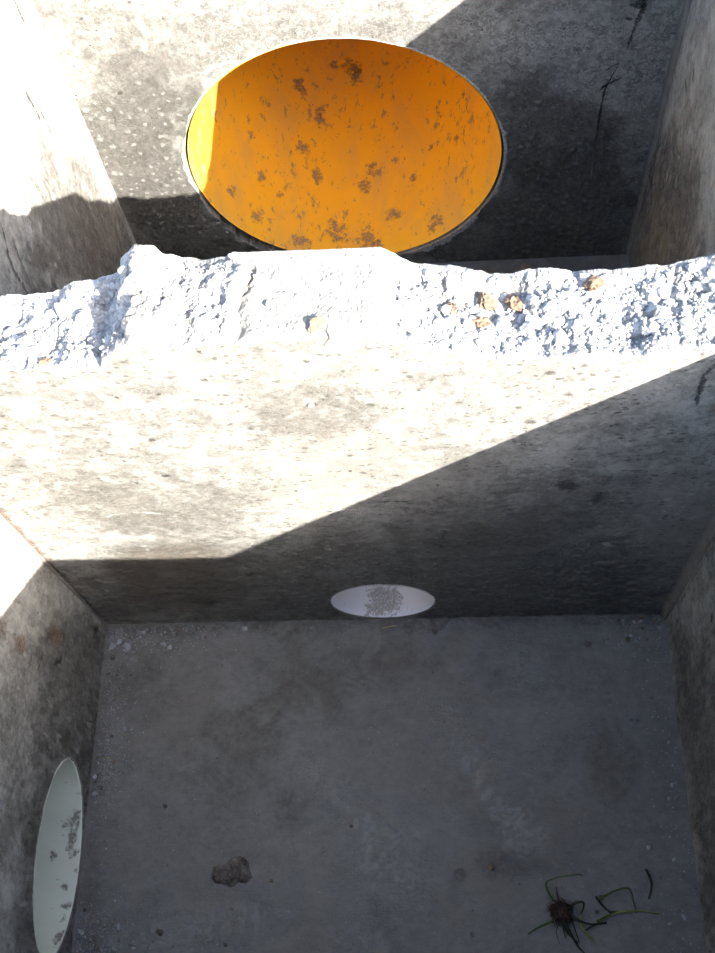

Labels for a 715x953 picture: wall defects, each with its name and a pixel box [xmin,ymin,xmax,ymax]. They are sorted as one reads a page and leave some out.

crack [592,63,622,170]
spalling [182,37,715,362]
spalling [0,244,250,373]